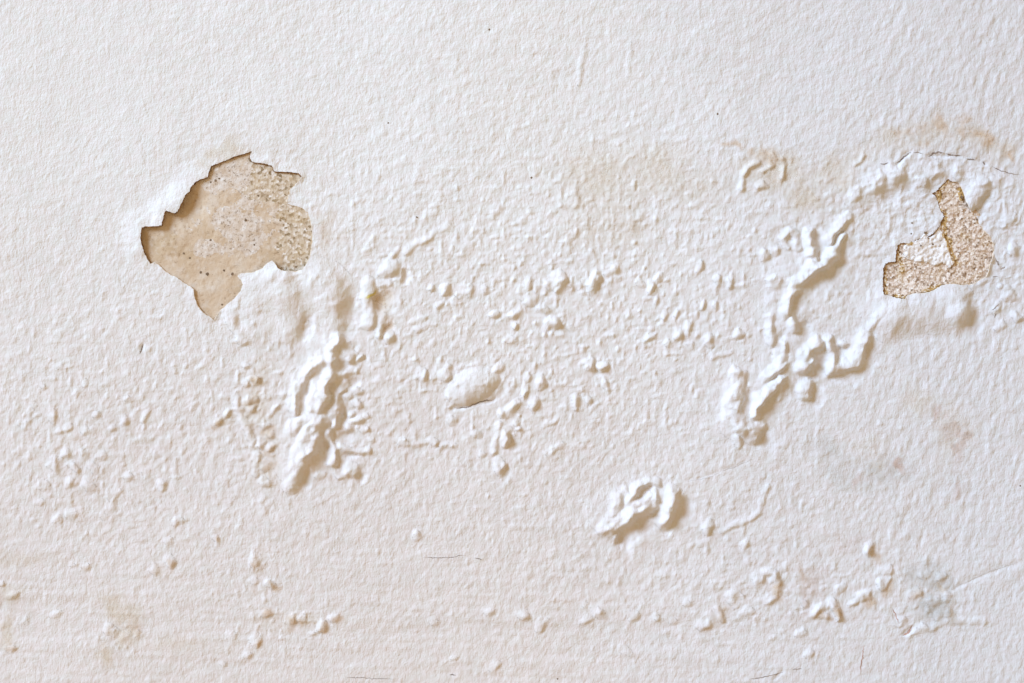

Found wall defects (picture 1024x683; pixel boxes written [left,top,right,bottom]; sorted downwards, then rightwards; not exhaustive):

peeling [140,151,313,320]
peeling [883,179,994,299]